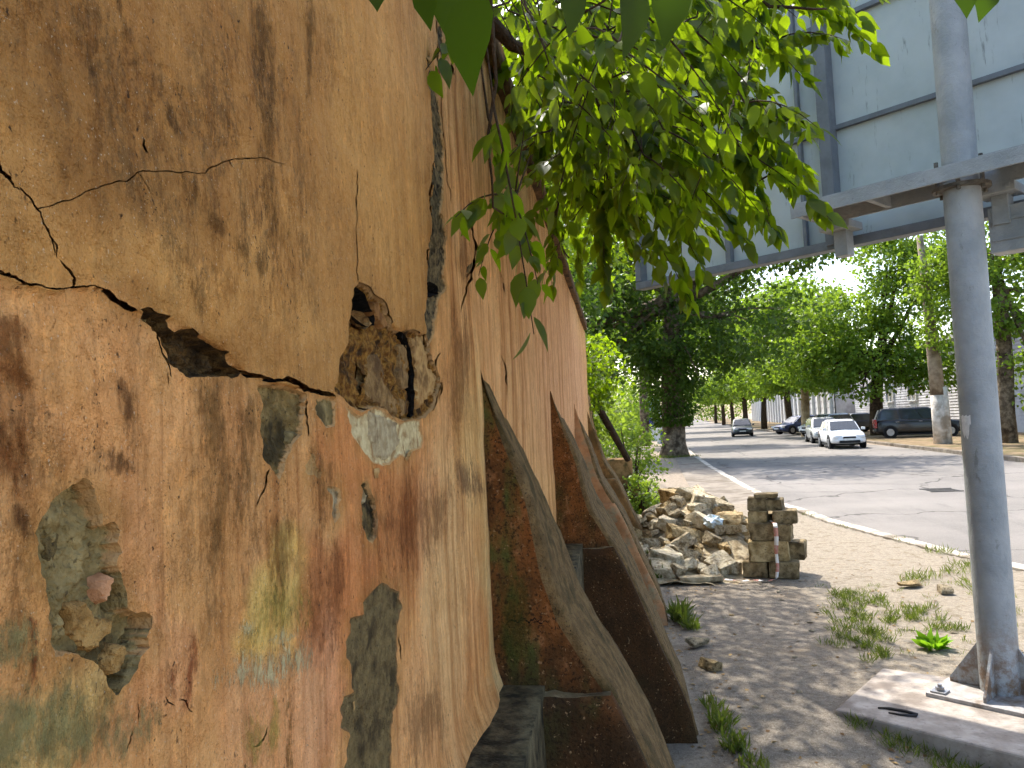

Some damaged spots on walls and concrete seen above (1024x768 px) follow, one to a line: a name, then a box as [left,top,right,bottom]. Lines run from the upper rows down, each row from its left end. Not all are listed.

crack [219,369,323,396]
spalling [257,283,441,544]
spalling [35,478,153,696]